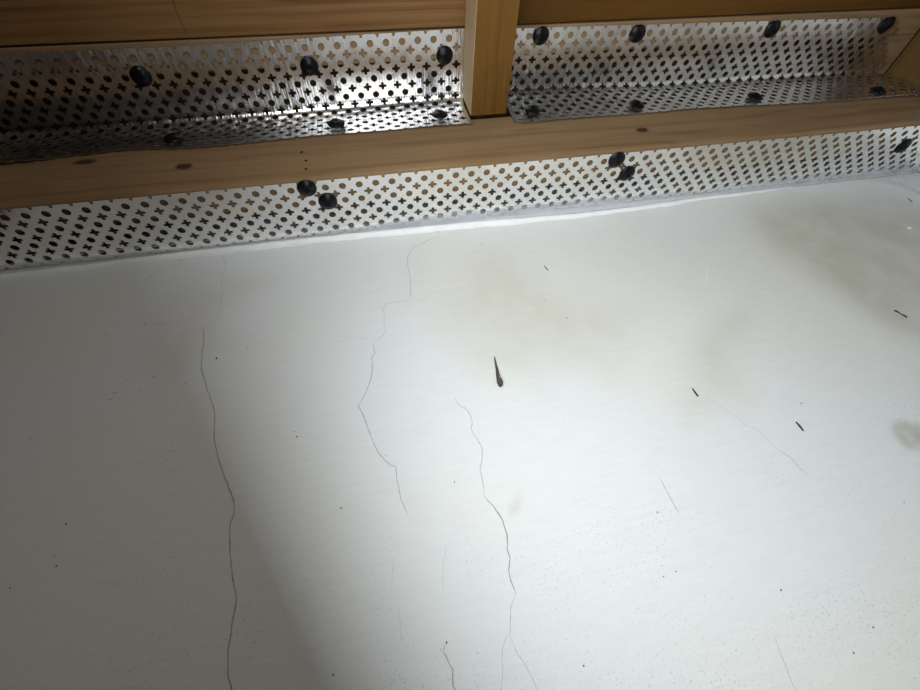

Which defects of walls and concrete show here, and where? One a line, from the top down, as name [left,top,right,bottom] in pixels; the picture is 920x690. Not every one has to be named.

crack [157,256,237,690]
crack [341,233,441,516]
crack [443,644,456,690]
crack [455,399,538,690]